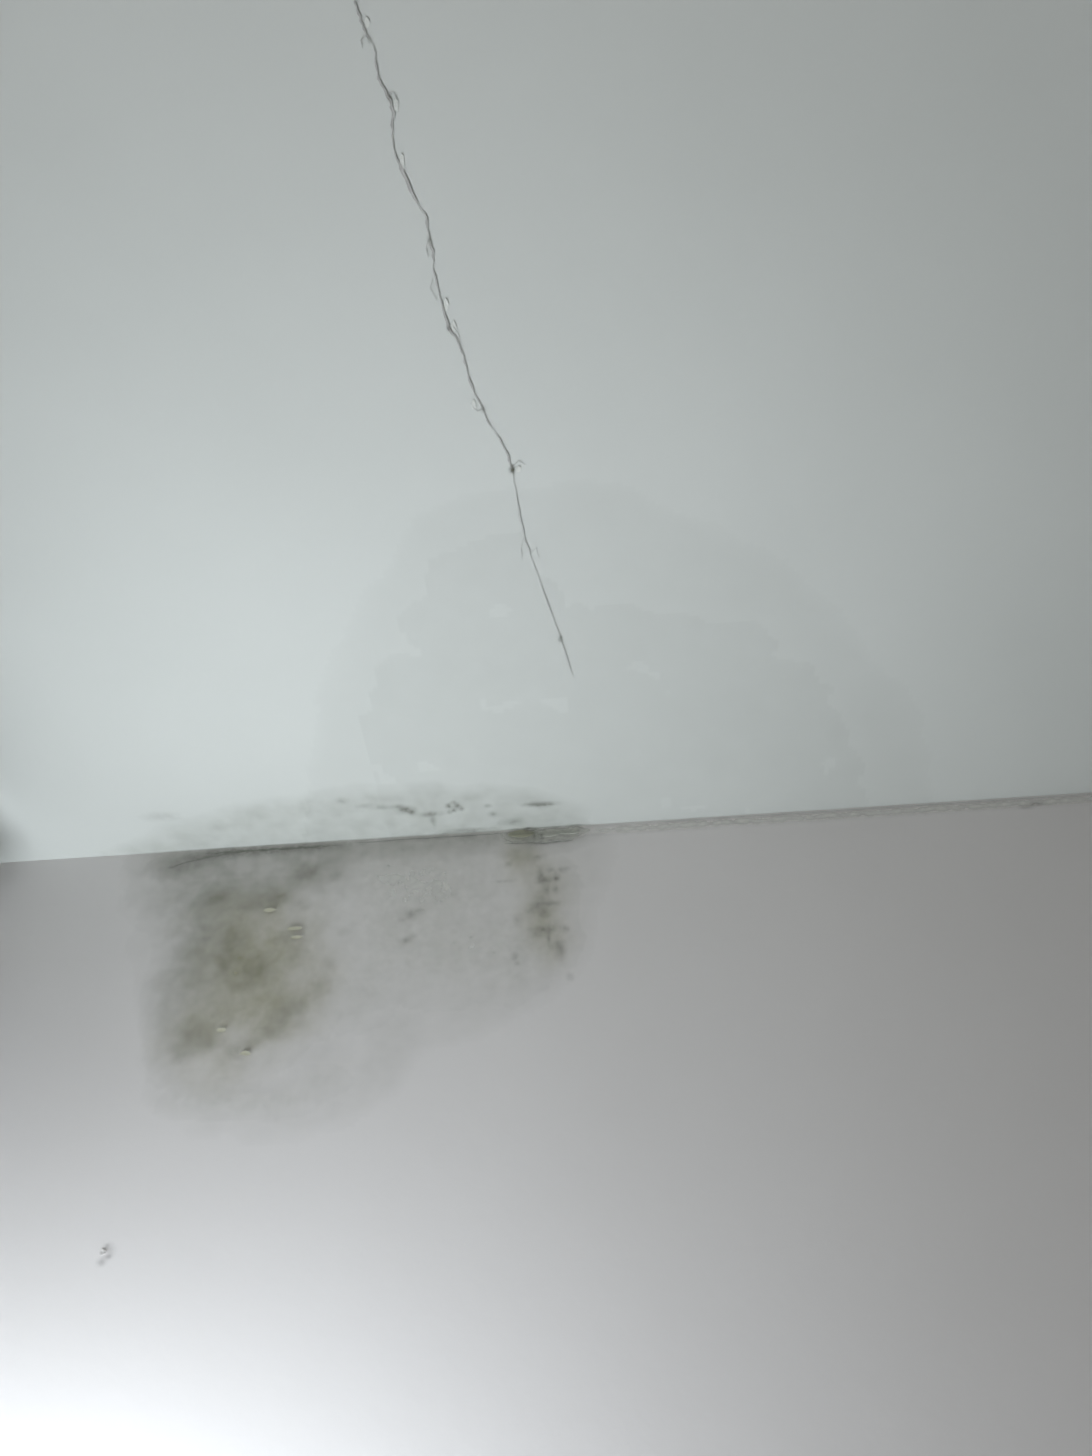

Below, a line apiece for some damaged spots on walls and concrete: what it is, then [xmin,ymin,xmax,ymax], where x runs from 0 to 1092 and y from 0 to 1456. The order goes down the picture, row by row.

crack [354,0,573,676]